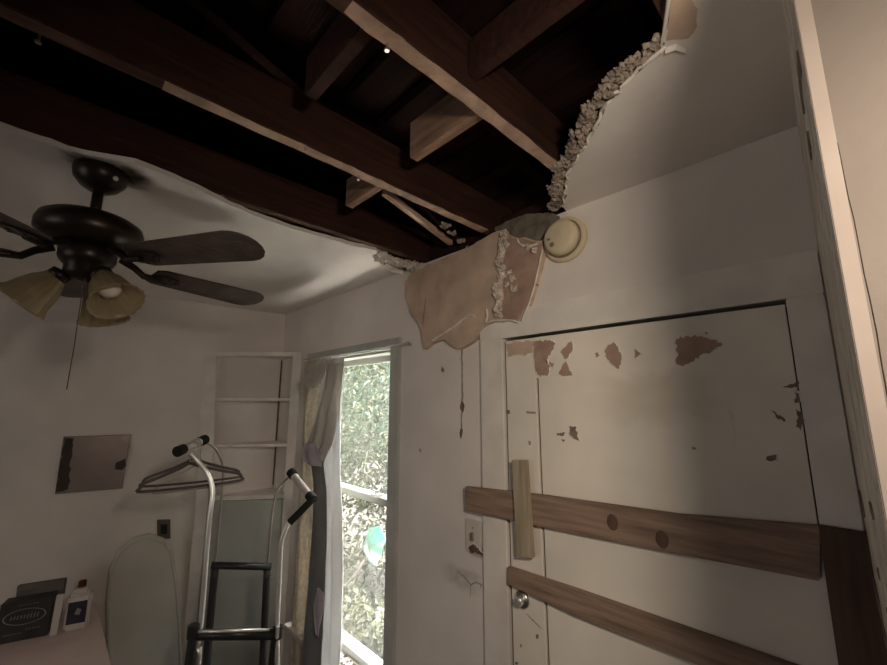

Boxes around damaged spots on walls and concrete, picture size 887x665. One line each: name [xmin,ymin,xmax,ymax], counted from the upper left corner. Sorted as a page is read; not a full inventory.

spalling [546,32,687,212]
spalling [372,249,425,275]
peeling [506,338,575,377]
peeling [595,341,623,369]
peeling [673,332,724,368]
spalling [772,381,804,430]
peeling [557,425,581,443]